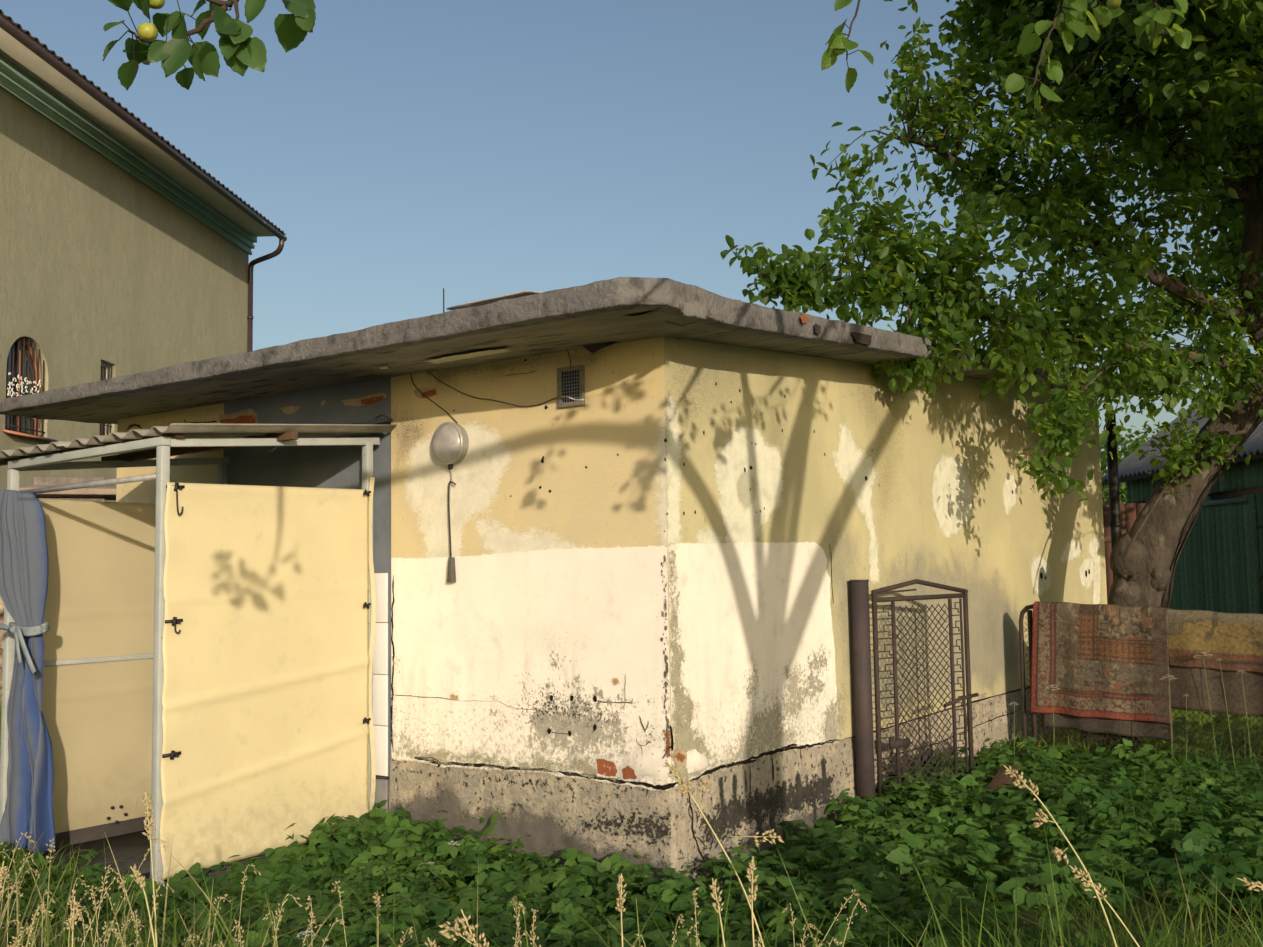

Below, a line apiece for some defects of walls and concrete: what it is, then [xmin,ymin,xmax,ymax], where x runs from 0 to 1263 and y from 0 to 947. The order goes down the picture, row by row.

water stain [389,768,671,900]
peeling [391,530,847,784]
crack [390,575,1030,863]
water stain [693,361,1026,887]